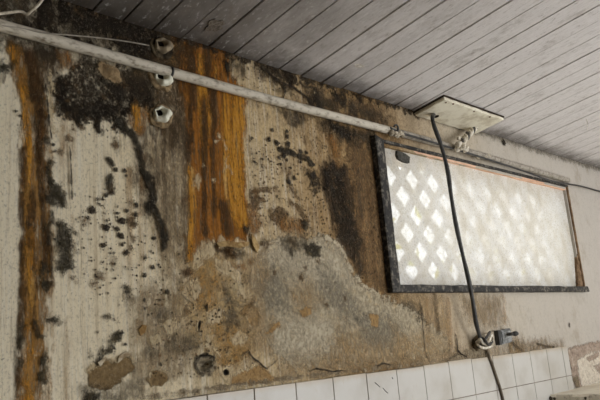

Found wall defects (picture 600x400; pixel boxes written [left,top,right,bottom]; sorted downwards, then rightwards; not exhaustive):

rust [171,36,239,86]
water stain [0,0,419,124]
rust [7,40,53,400]
water stain [0,36,253,378]
rust [178,80,263,262]
water stain [247,107,387,289]
water stain [38,352,49,387]
flaking render [87,351,135,391]
spalling [138,226,451,387]